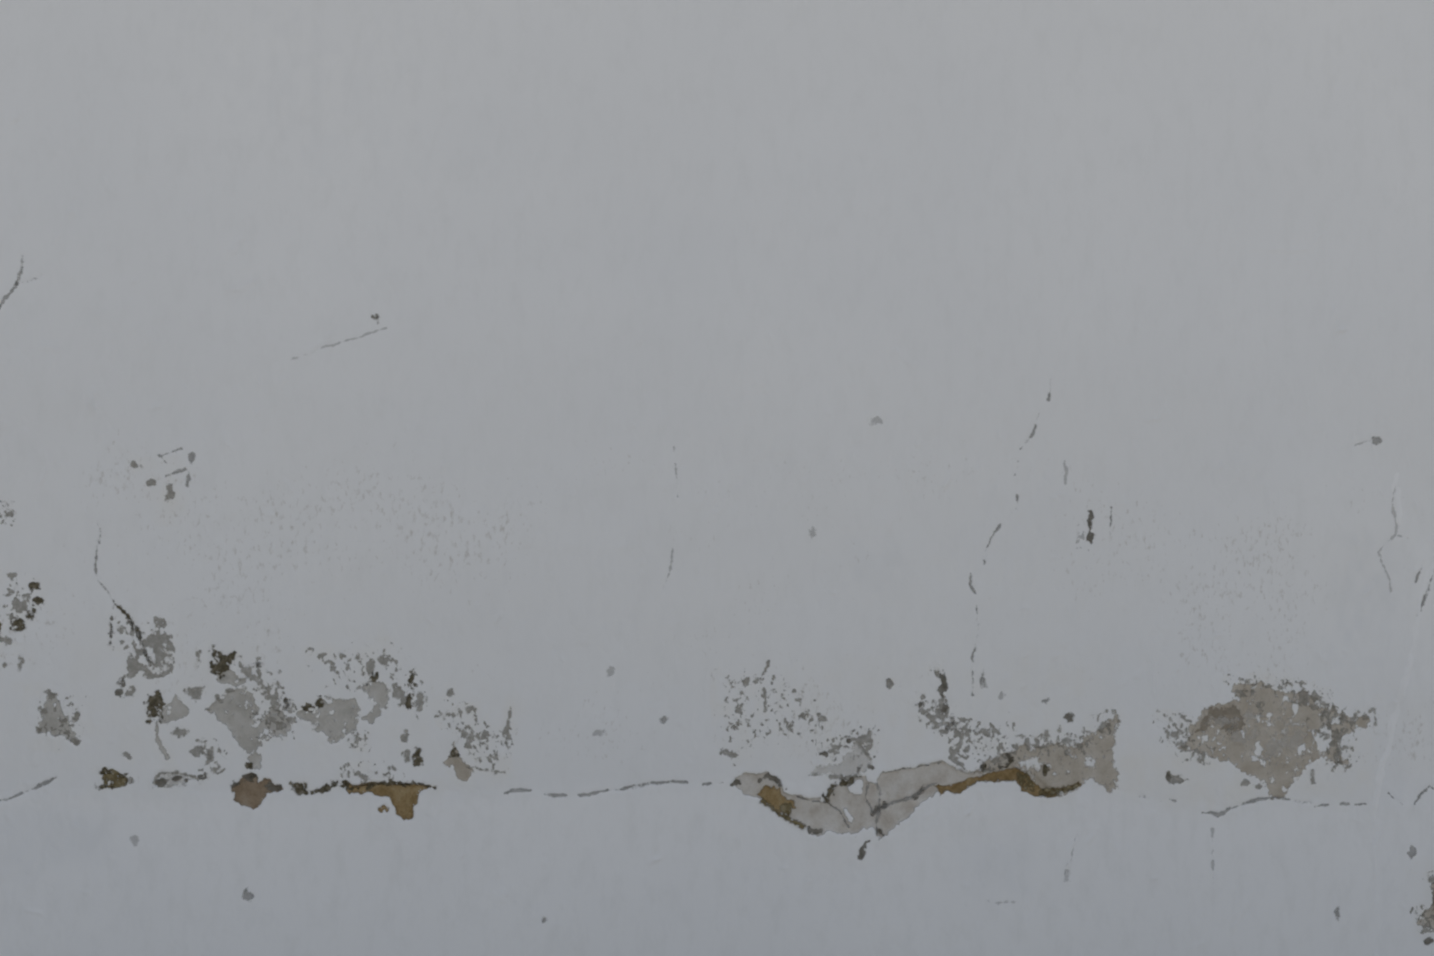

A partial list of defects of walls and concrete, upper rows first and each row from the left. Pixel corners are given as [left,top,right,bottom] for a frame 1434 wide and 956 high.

crack [9,778,54,799]
flaking render [99,752,133,790]
peeling [143,646,514,820]
crack [504,780,711,797]
flaking render [730,709,1120,860]
peeling [1153,674,1377,800]
crack [1172,786,1434,817]
peeling [1410,876,1434,945]